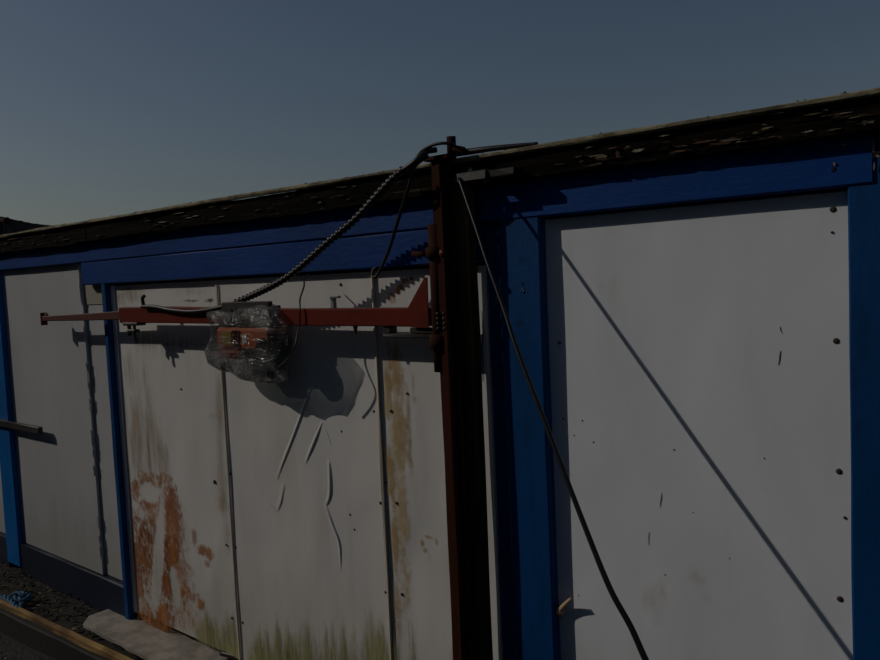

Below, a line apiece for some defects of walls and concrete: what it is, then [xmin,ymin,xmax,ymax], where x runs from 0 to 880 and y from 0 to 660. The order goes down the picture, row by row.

peeling [577,124,777,167]
corrosion [131,474,212,632]